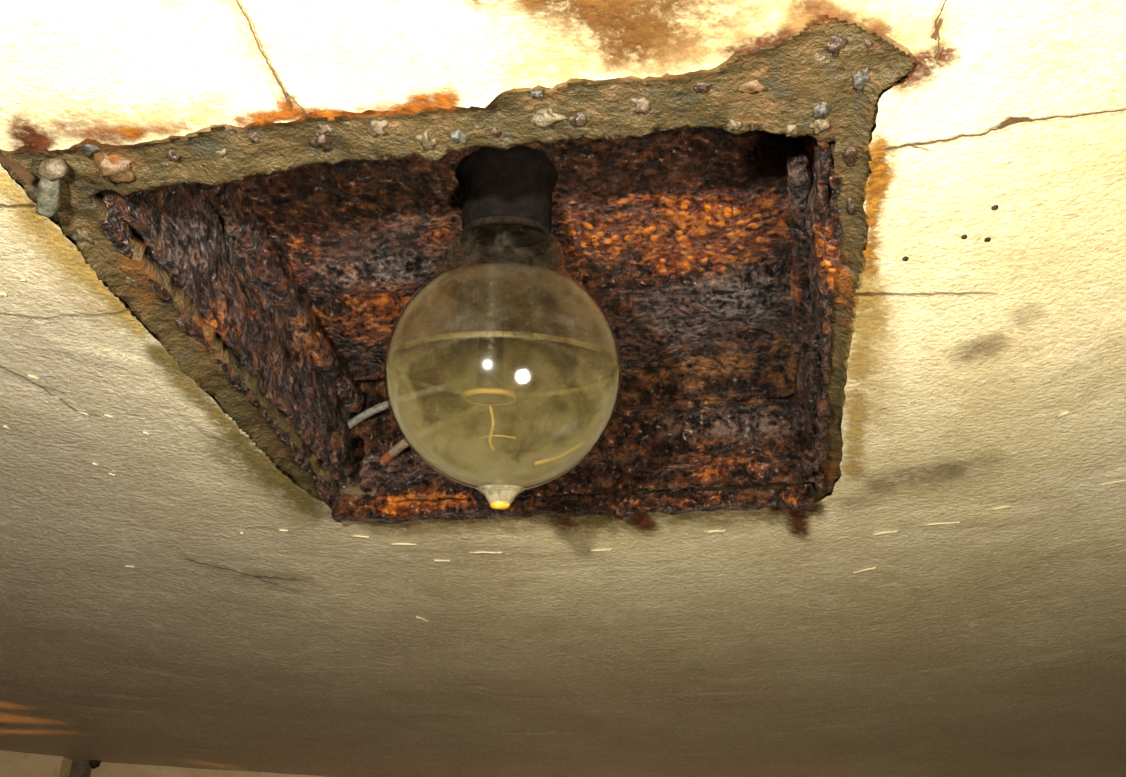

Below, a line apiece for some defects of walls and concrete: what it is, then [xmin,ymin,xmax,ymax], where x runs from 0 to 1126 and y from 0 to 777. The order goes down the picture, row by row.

crack [236,0,305,115]
corrosion [517,0,682,66]
corrosion [726,0,892,53]
corrosion [11,118,54,152]
corrosion [71,127,186,141]
corrosion [236,91,459,126]
crack [885,109,1126,150]
spalling [0,15,916,506]